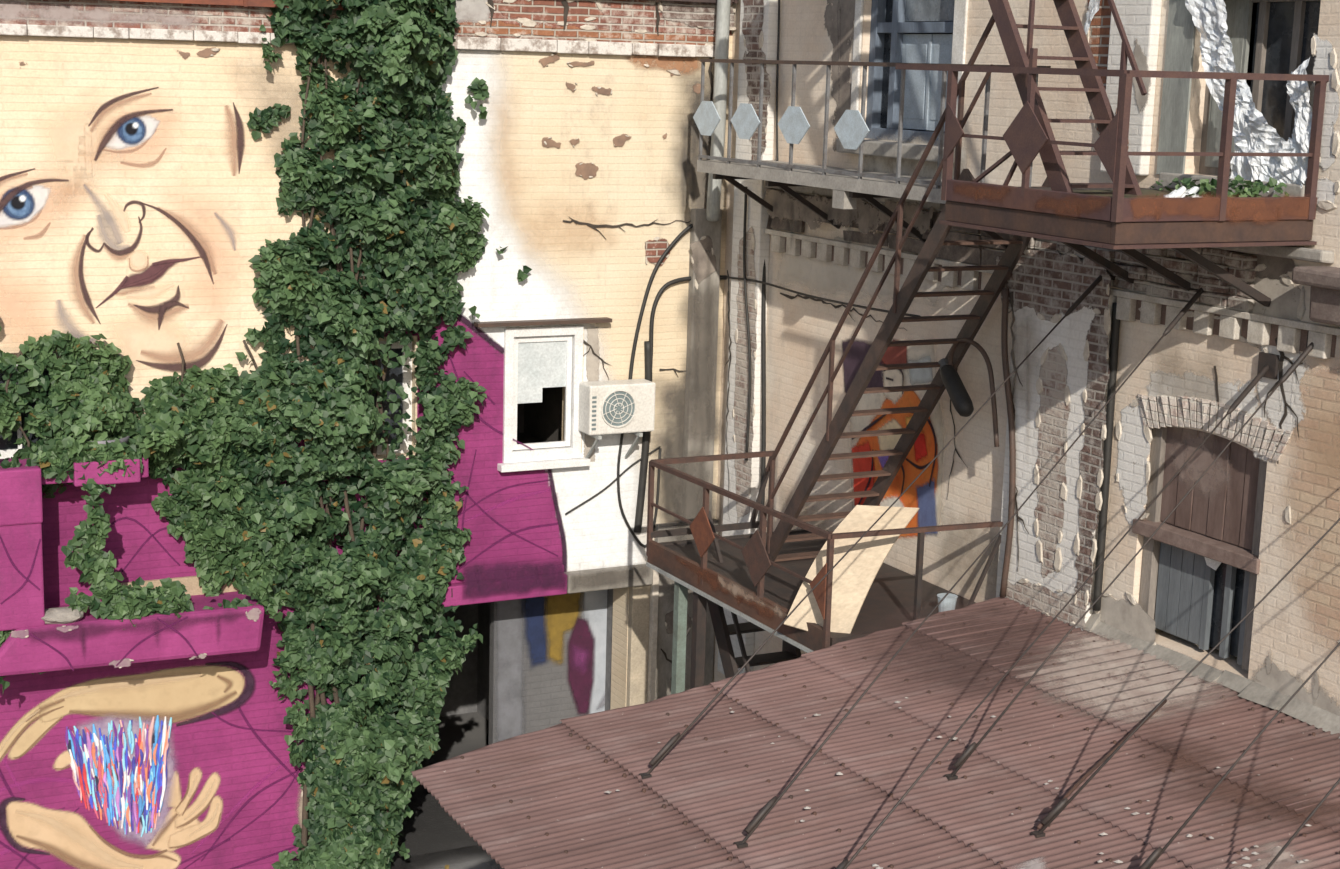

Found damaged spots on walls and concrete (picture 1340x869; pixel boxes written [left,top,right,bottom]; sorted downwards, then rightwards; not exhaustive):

flaking render [575,162,599,180]
flaking render [454,0,772,160]
crack [563,217,691,239]
peeling [824,0,855,151]
flaking render [1085,0,1111,91]
rust [1131,196,1310,222]
peeling [1303,33,1340,211]
peeling [1001,249,1340,645]